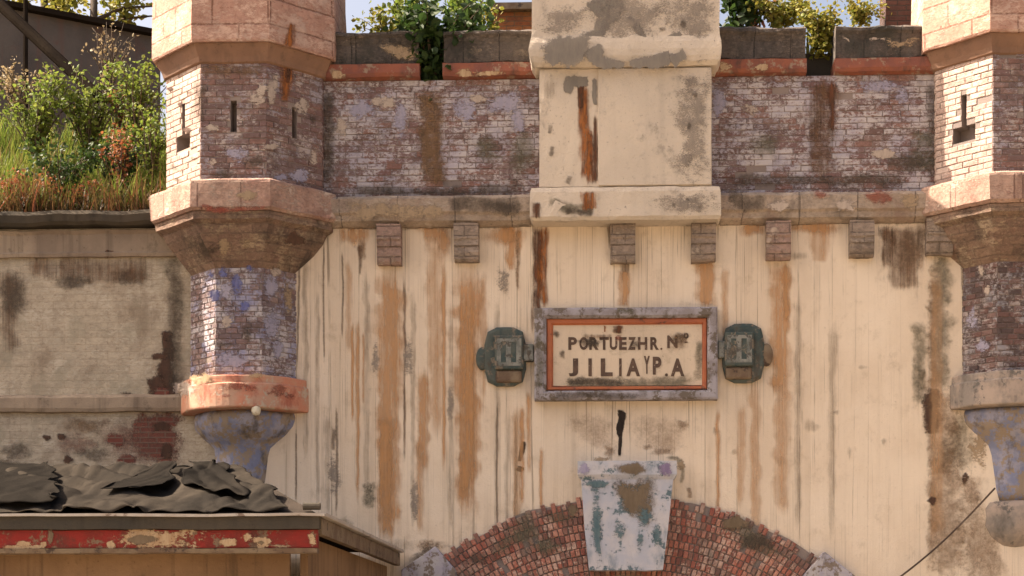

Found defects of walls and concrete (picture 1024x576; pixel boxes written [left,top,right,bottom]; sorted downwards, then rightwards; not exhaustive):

peeling [541,0,727,181]
corrosion [578,86,598,210]
corrosion [531,203,548,319]
damp [882,230,920,287]
flaking render [146,331,294,398]
flaking render [107,412,183,463]
peeling [646,446,690,491]
damp [912,258,963,564]
peeling [1,530,53,549]
peeling [106,529,206,549]
peeling [219,533,287,548]
peeling [579,449,661,562]